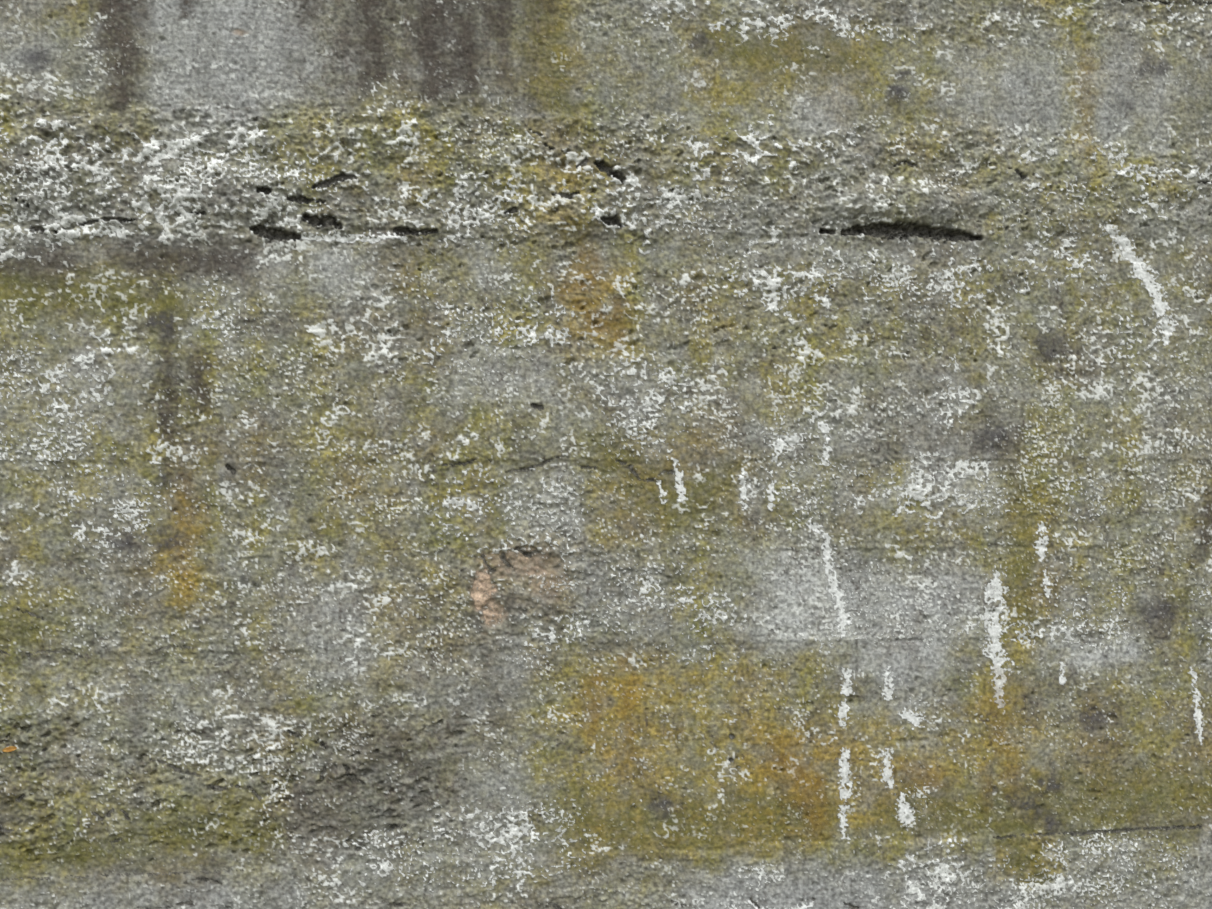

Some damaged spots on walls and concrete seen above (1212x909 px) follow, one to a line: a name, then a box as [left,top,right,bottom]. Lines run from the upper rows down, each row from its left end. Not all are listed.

leakage [1104,220,1177,346]
leakage [656,458,688,504]
leakage [764,430,800,511]
leakage [818,420,832,466]
leakage [806,517,855,638]
leakage [1033,521,1051,598]
leakage [981,565,1014,708]
leakage [838,668,855,726]
leakage [879,666,925,727]
leakage [1188,667,1203,745]
leakage [838,747,855,843]
leakage [882,748,915,833]